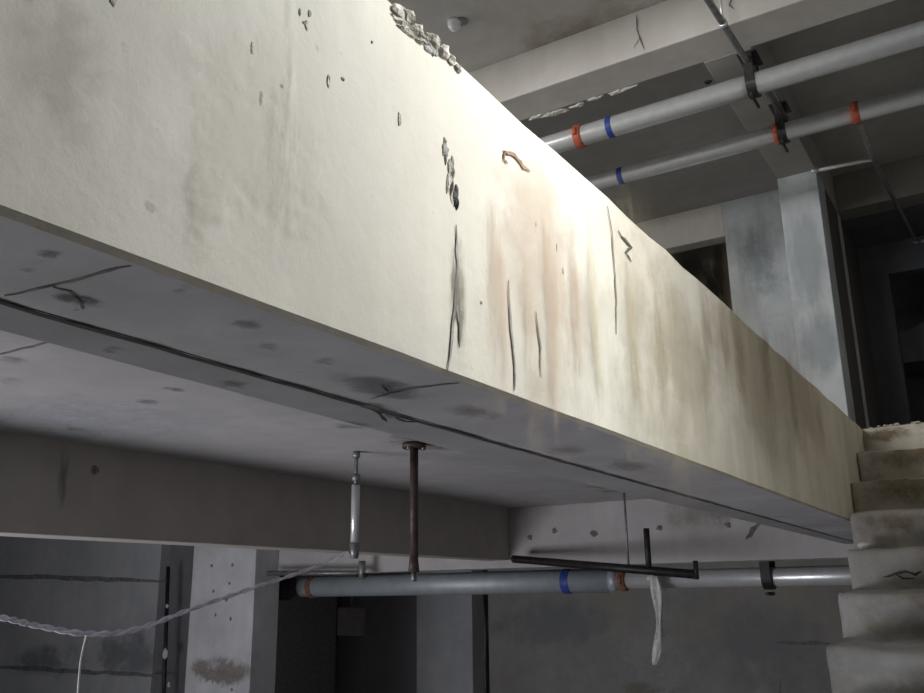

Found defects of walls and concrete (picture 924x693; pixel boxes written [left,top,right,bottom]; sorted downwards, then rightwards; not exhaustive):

spalling [389,3,462,74]
crack [503,150,531,172]
crack [0,206,853,542]
crack [883,570,922,579]
water stain [194,660,247,684]